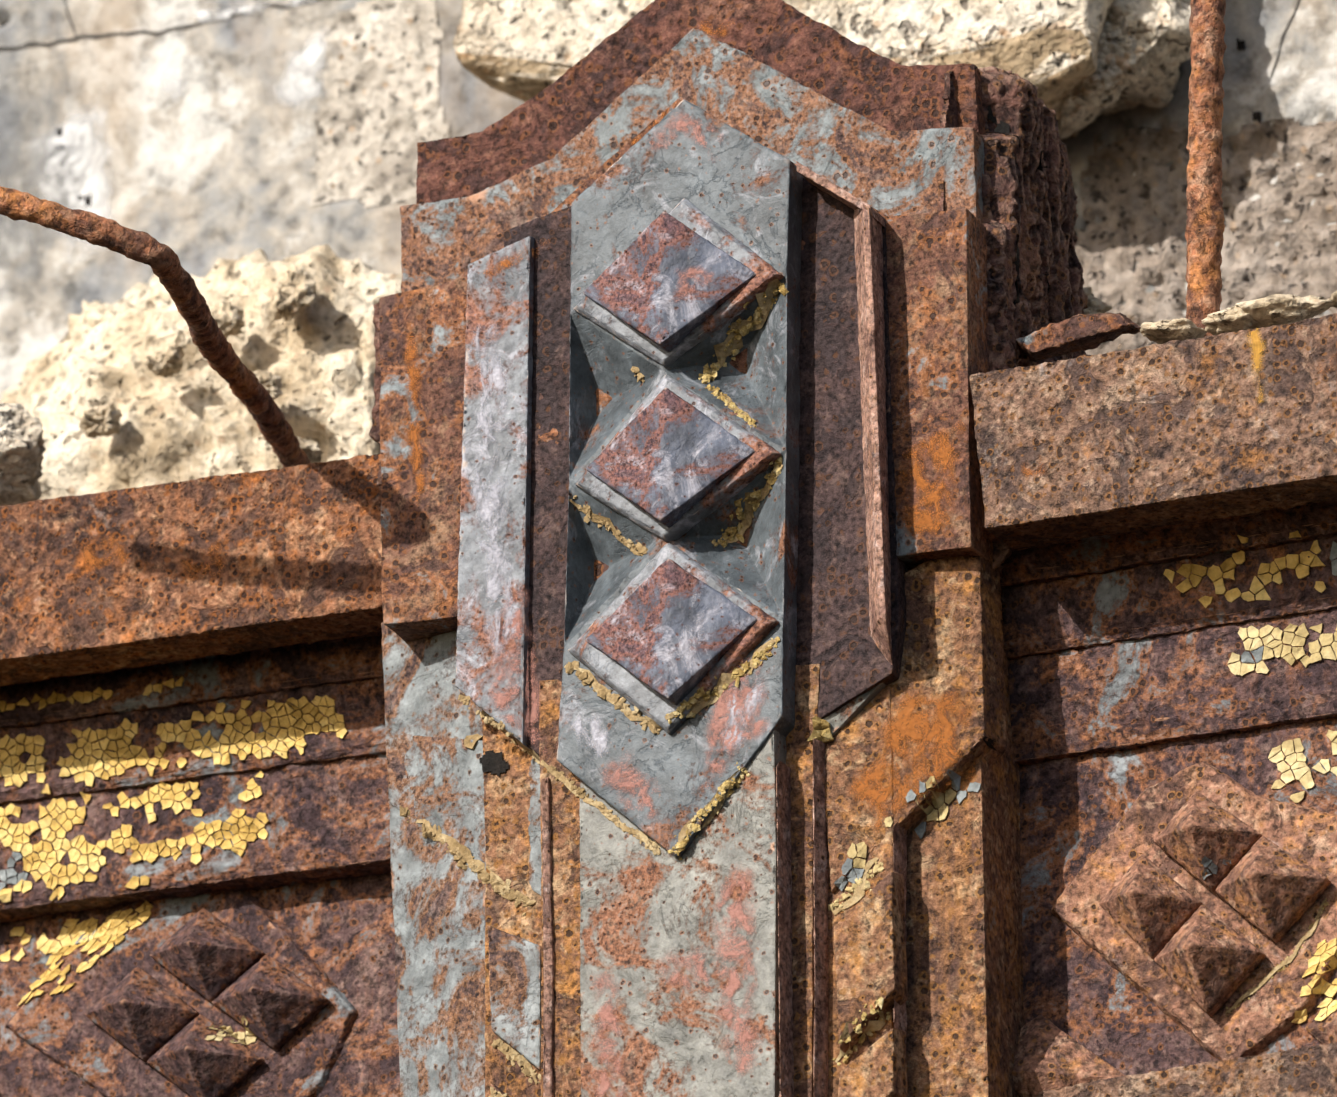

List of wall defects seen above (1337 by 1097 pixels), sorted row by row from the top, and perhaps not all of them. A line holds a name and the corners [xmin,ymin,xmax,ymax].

crack [0,0,320,50]
spalling [1074,122,1190,355]
spalling [1220,118,1337,318]
rust [1251,328,1263,369]
rust [901,434,953,531]
rust [493,592,538,742]
rust [709,660,764,770]
rust [853,696,976,827]
peeling [1227,623,1337,676]
peeling [1268,730,1337,803]
peeling [0,695,348,1006]
peeling [1224,898,1337,1024]